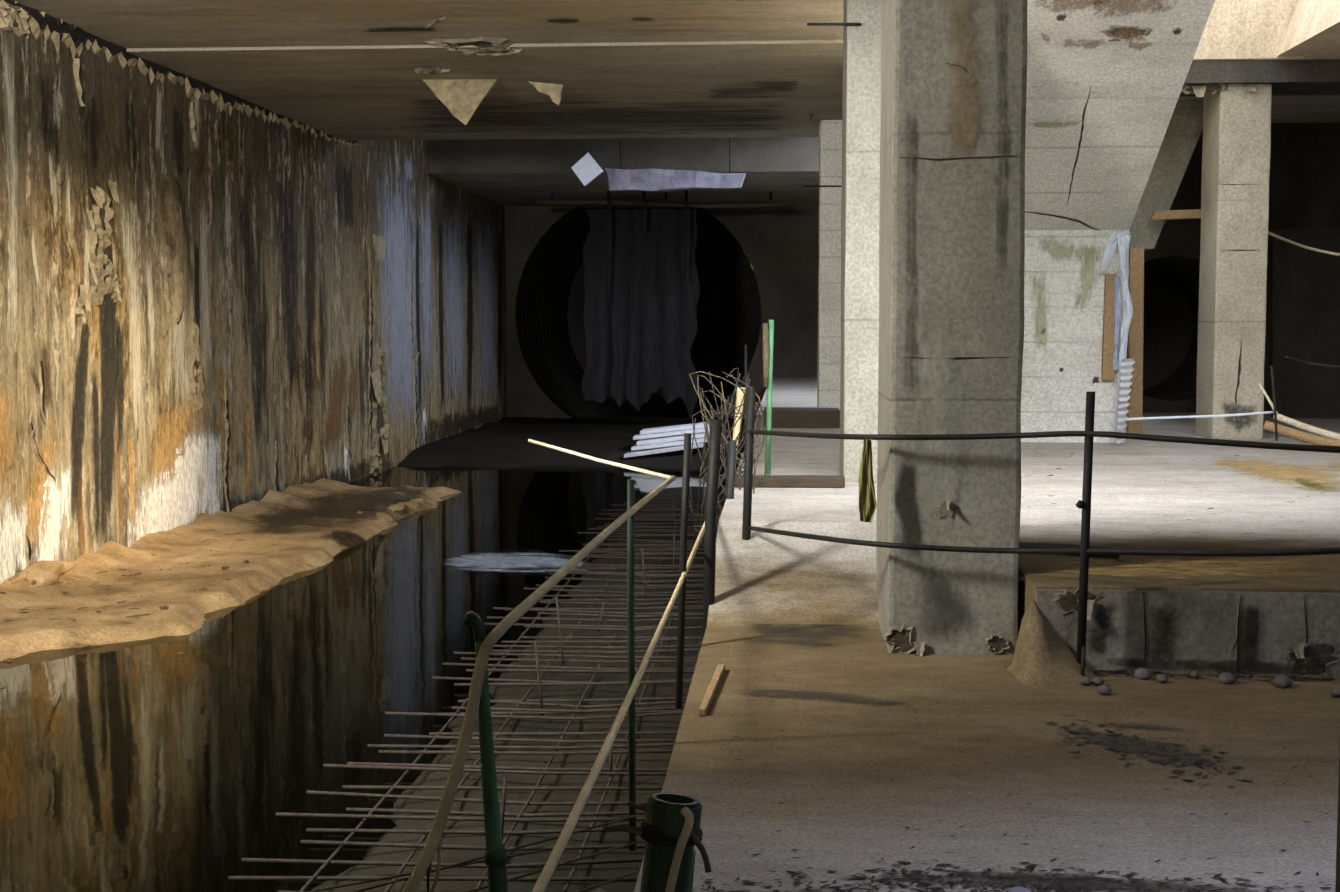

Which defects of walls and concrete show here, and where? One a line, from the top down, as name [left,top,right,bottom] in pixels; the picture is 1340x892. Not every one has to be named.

corrosion [1045,0,1169,50]
crack [1025,85,1099,230]
corrosion [26,429,56,543]
damp [0,45,155,584]
spalling [75,180,122,327]
corrosion [114,436,135,532]
corrosion [154,375,227,491]
damp [173,210,211,414]
damp [128,396,425,548]
damp [278,189,325,441]
damp [359,158,502,445]
crack [1234,339,1242,405]